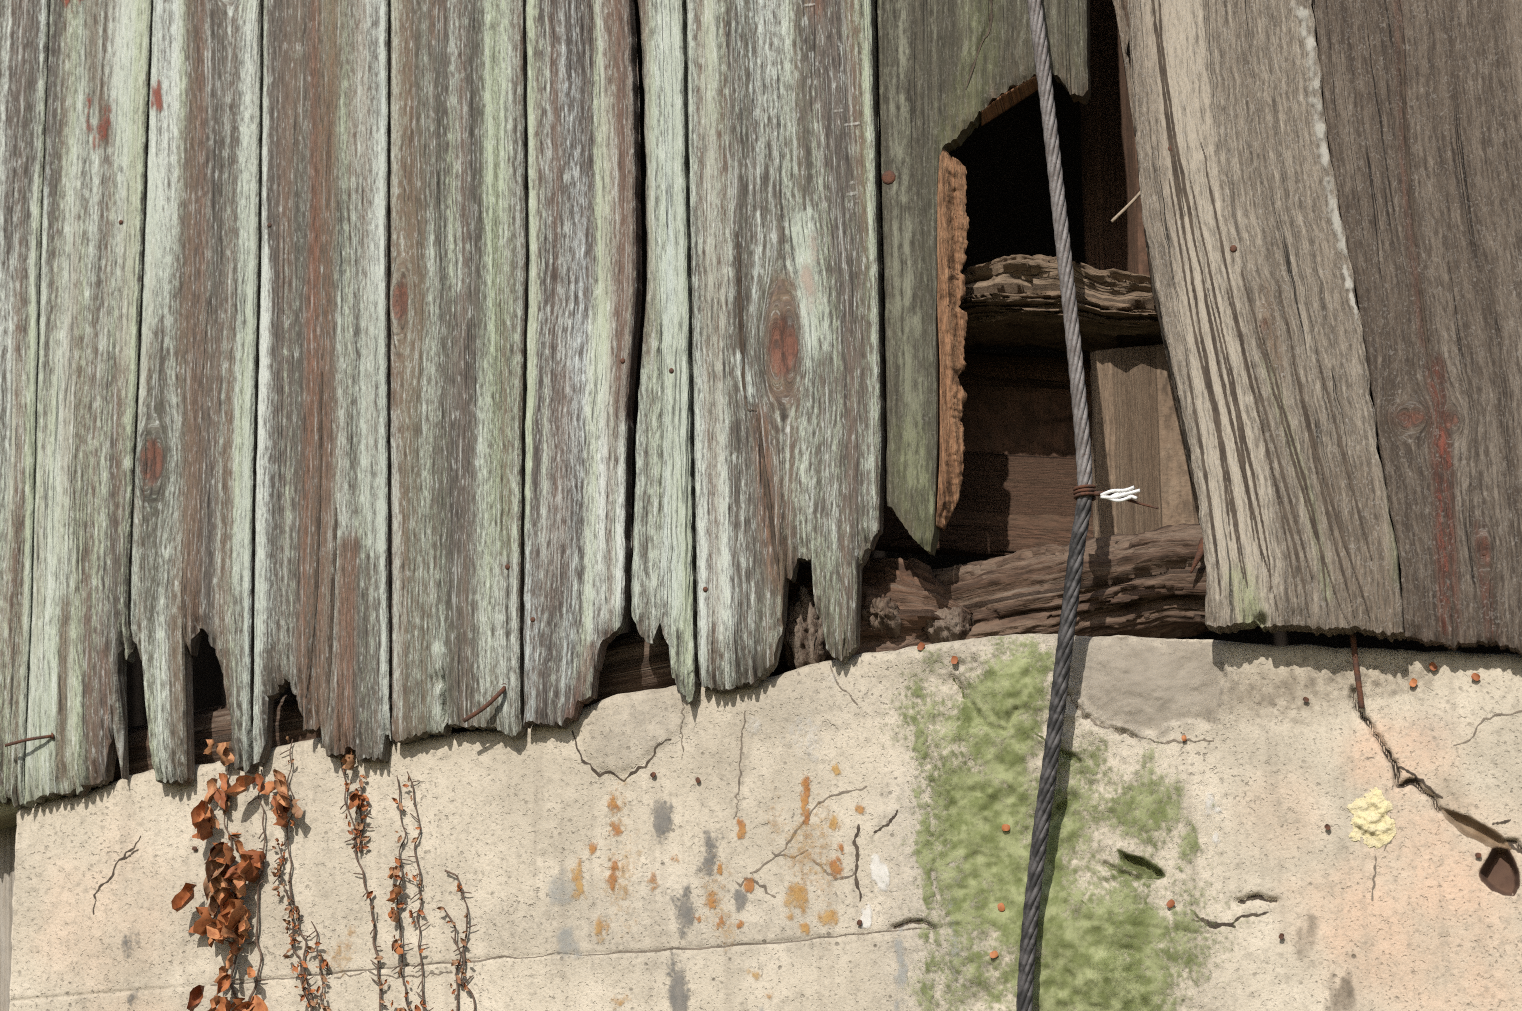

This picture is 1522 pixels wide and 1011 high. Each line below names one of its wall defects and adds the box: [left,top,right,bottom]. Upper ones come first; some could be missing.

crack [210,786,943,1011]
corrosion [572,844,597,897]
crack [572,701,685,782]
corrosion [737,819,746,839]
corrosion [800,777,810,824]
corrosion [786,816,844,934]
water stain [912,684,958,956]
water stain [1080,860,1137,1011]
water stain [1103,747,1217,870]
crack [1352,691,1443,901]
spalling [1442,808,1520,896]
crack [1492,819,1522,853]